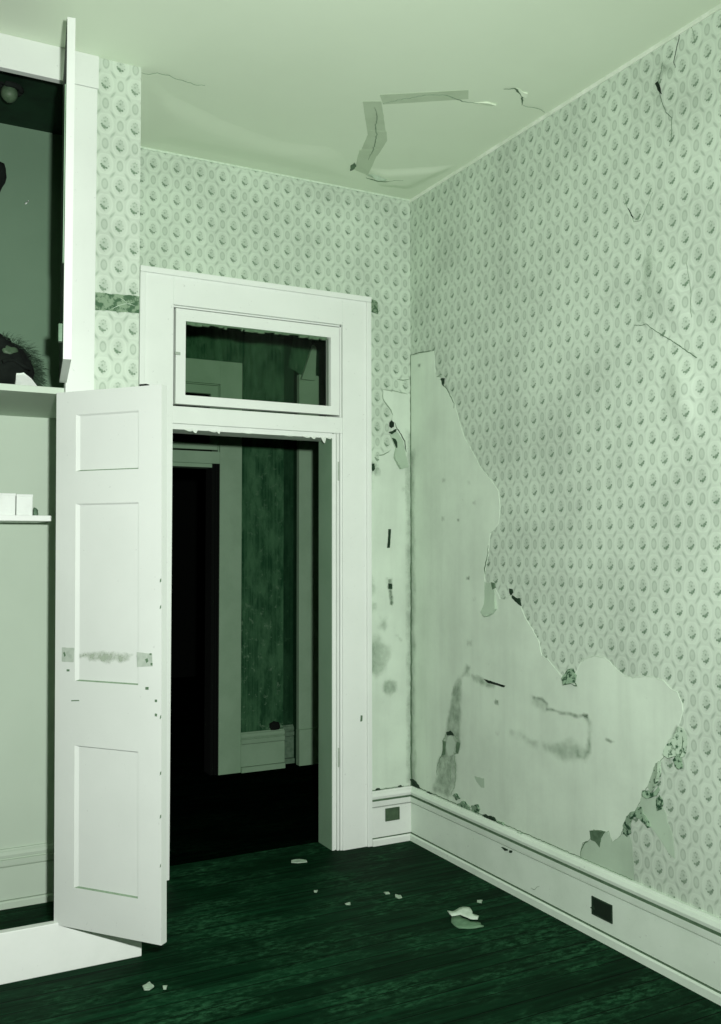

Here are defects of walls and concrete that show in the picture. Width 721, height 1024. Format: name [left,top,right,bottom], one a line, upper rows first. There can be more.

crack [368,88,544,160]
peeling [481,582,497,617]
peeling [561,668,577,685]
water stain [436,731,460,794]
peeling [623,761,675,858]